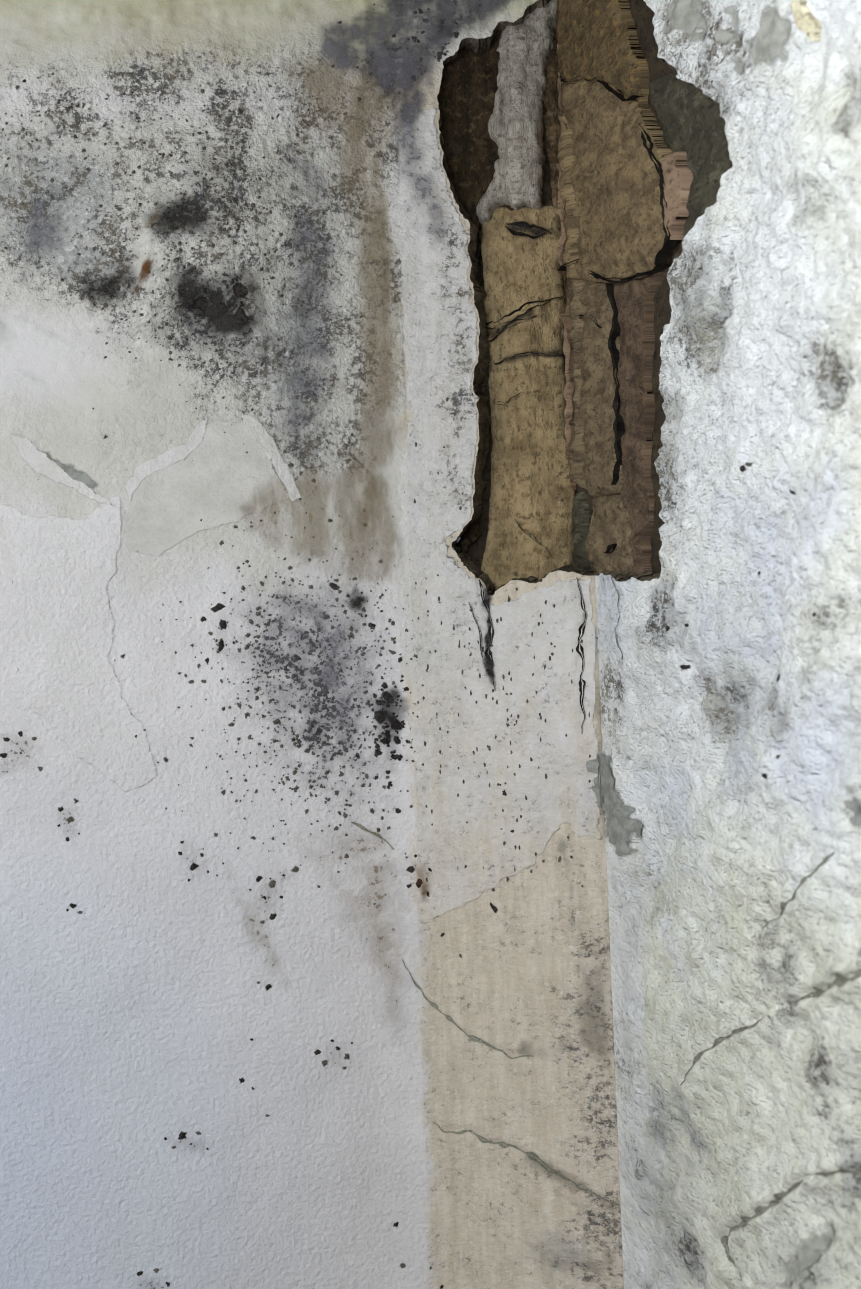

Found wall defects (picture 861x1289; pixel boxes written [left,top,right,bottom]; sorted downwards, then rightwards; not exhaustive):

leakage [271,0,507,237]
leakage [0,70,432,966]
flaking render [388,0,822,924]
crack [762,852,835,929]
crack [403,961,533,1059]
crack [680,969,861,1086]
crack [433,1122,620,1207]
crack [721,1169,861,1282]